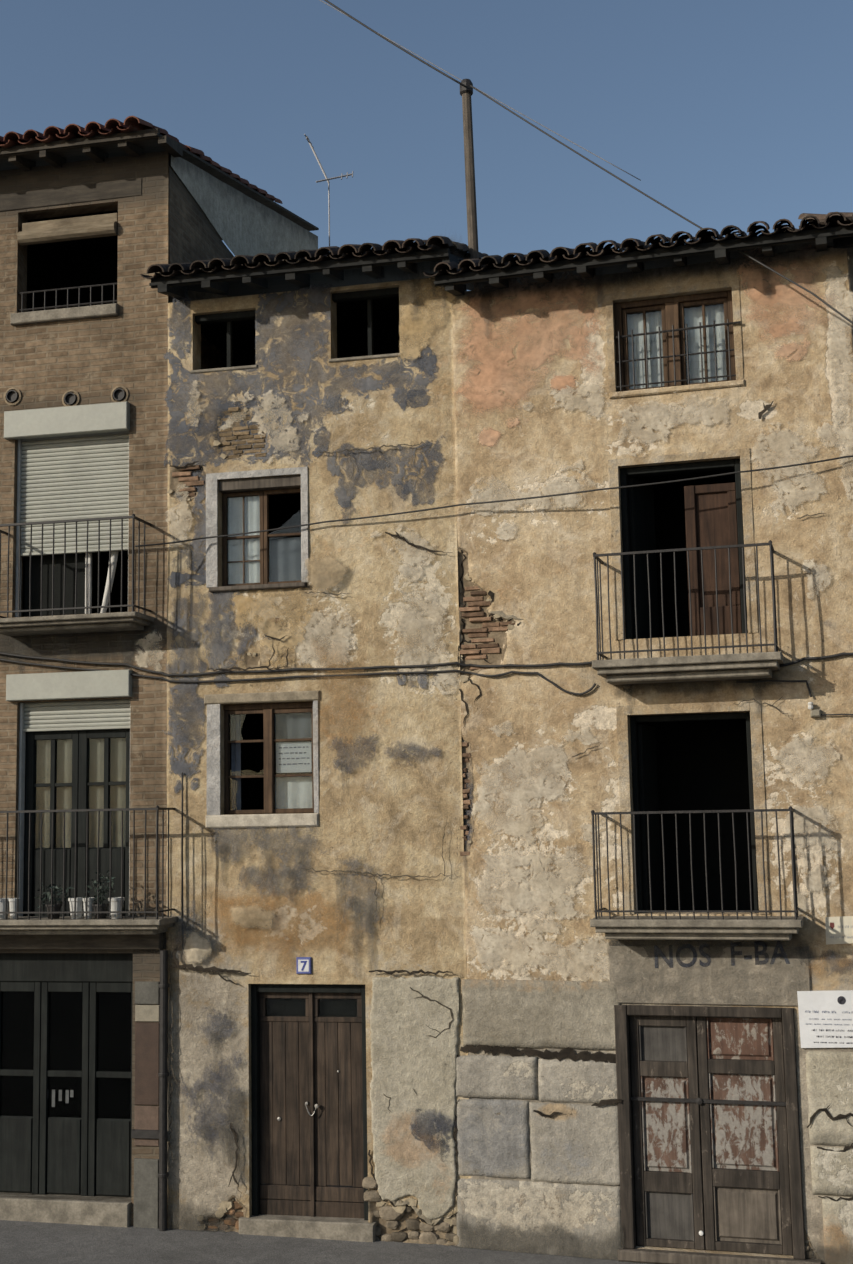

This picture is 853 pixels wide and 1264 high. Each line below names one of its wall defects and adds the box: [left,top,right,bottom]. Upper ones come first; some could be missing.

peeling [618,392,729,456]
peeling [135,267,604,793]
crack [385,531,523,728]
crack [369,969,616,1063]
crack [168,945,251,1197]
water stain [182,1056,245,1180]
water stain [411,1110,452,1151]
crack [533,1110,562,1118]
crack [591,1099,622,1107]
crack [807,1105,853,1152]
spalling [203,1195,247,1232]
spalling [362,1177,459,1245]